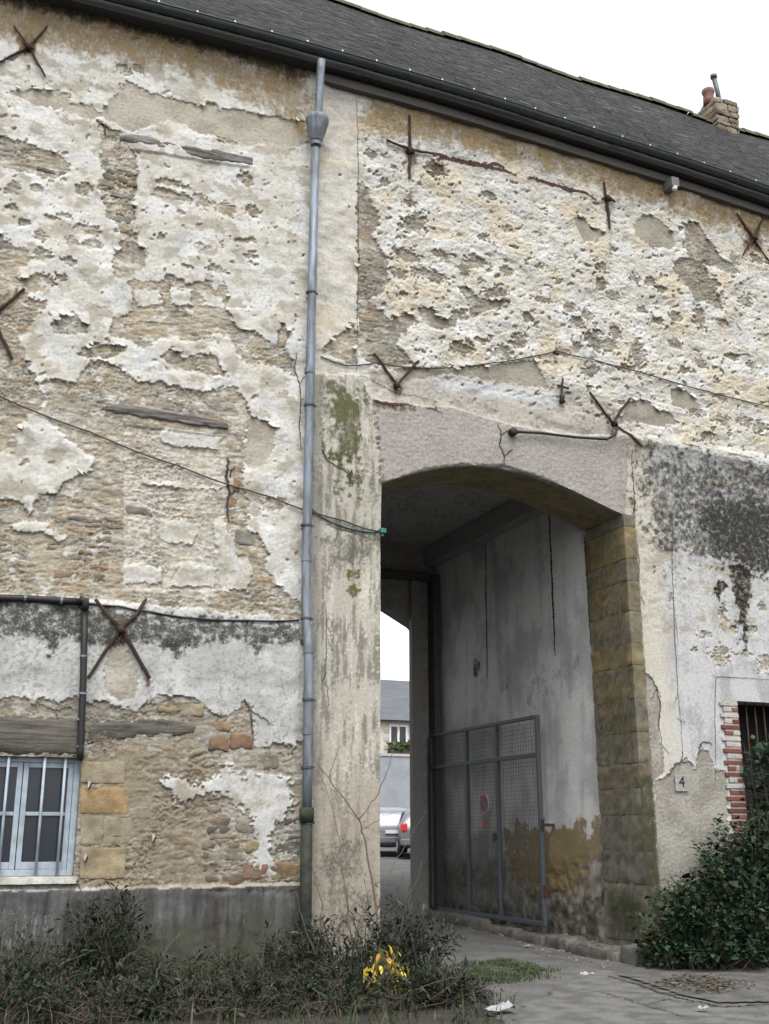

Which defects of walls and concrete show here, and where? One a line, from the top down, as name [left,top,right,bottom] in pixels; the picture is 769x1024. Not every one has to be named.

flaking render [0,63,310,620]